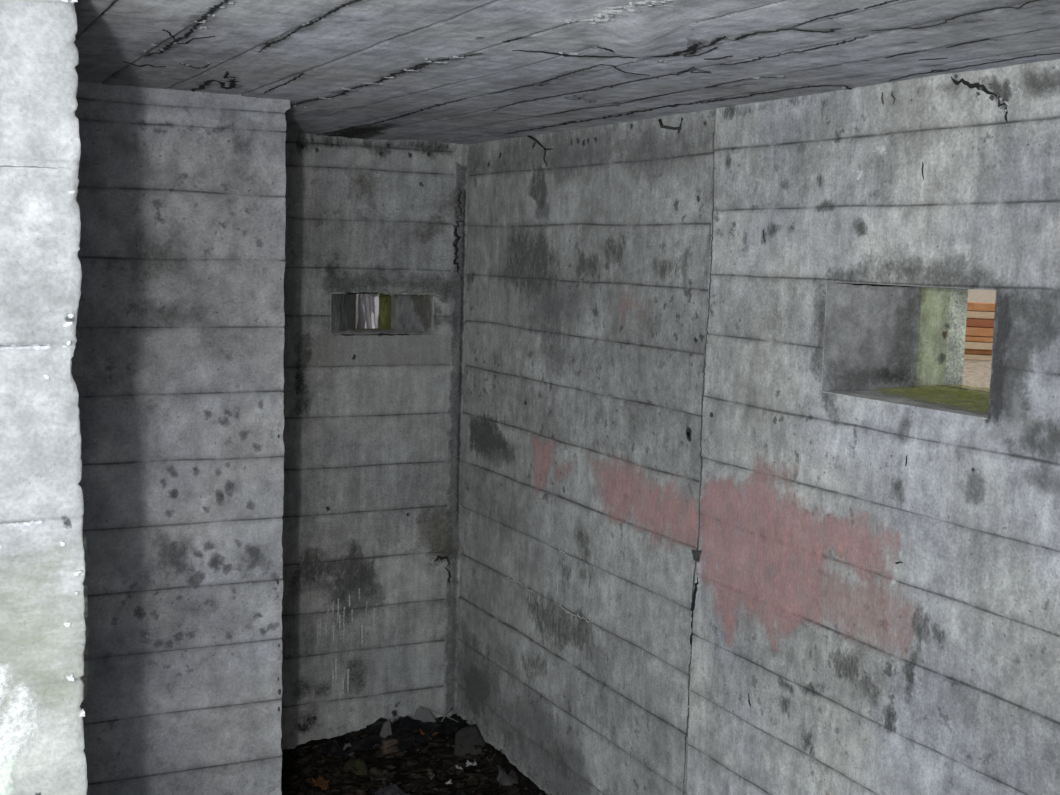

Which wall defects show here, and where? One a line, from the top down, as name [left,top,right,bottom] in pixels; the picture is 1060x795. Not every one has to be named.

crack [123,0,238,92]
crack [259,0,1060,135]
crack [453,184,463,277]
leakage [410,164,593,795]
crack [683,144,714,794]
leakage [292,542,381,648]
crack [434,555,451,585]